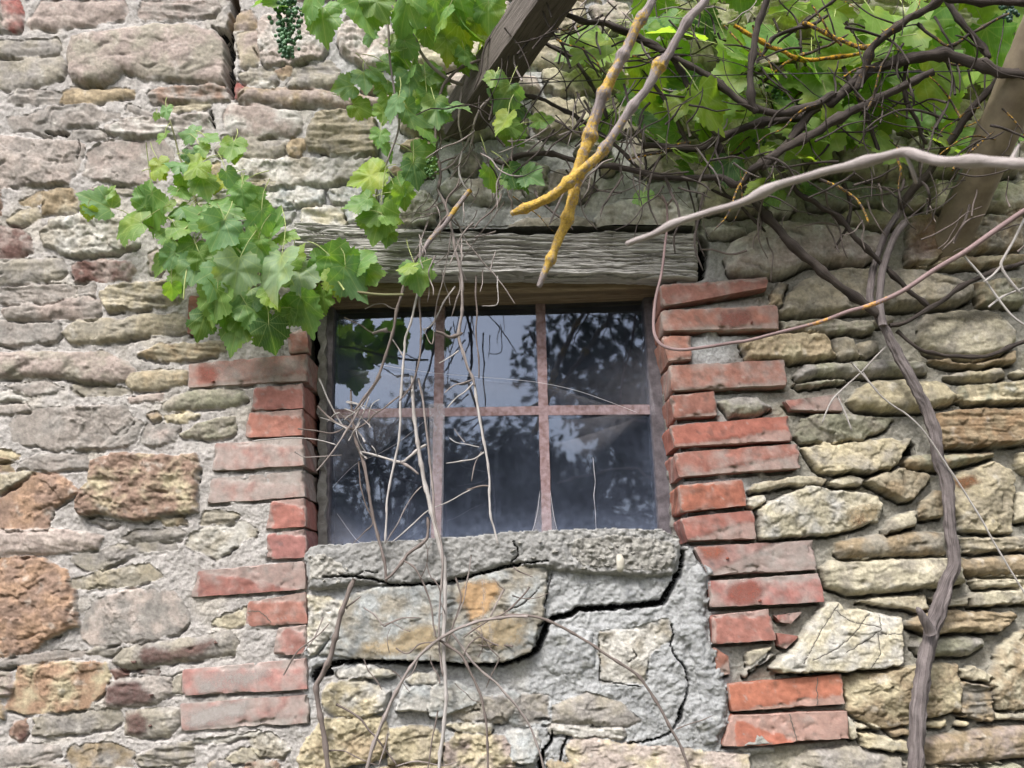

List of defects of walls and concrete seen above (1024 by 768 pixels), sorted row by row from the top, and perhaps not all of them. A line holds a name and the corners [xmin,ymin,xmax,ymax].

crack [331,541,688,744]